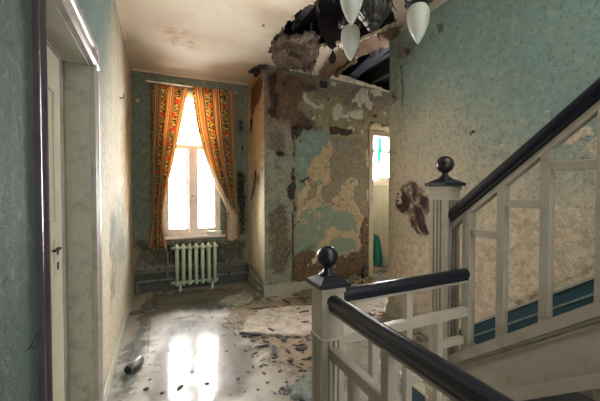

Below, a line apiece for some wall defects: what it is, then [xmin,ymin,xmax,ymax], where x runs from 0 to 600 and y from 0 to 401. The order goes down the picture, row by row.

water stain [267,72,316,157]
water stain [288,168,309,212]
peeling [296,58,389,266]
water stain [268,205,290,274]